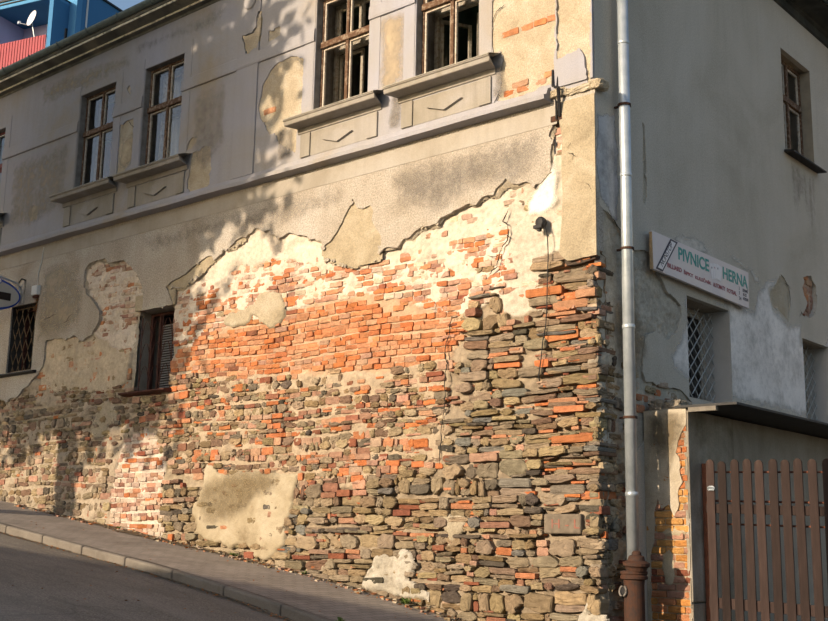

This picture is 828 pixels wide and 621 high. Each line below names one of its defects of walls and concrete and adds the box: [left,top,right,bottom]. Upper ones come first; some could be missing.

spalling [492,0,595,101]
spalling [259,56,304,152]
spalling [769,274,789,321]
spalling [802,276,818,317]
spalling [0,111,627,621]
spalling [633,250,689,447]
spalling [647,426,691,621]